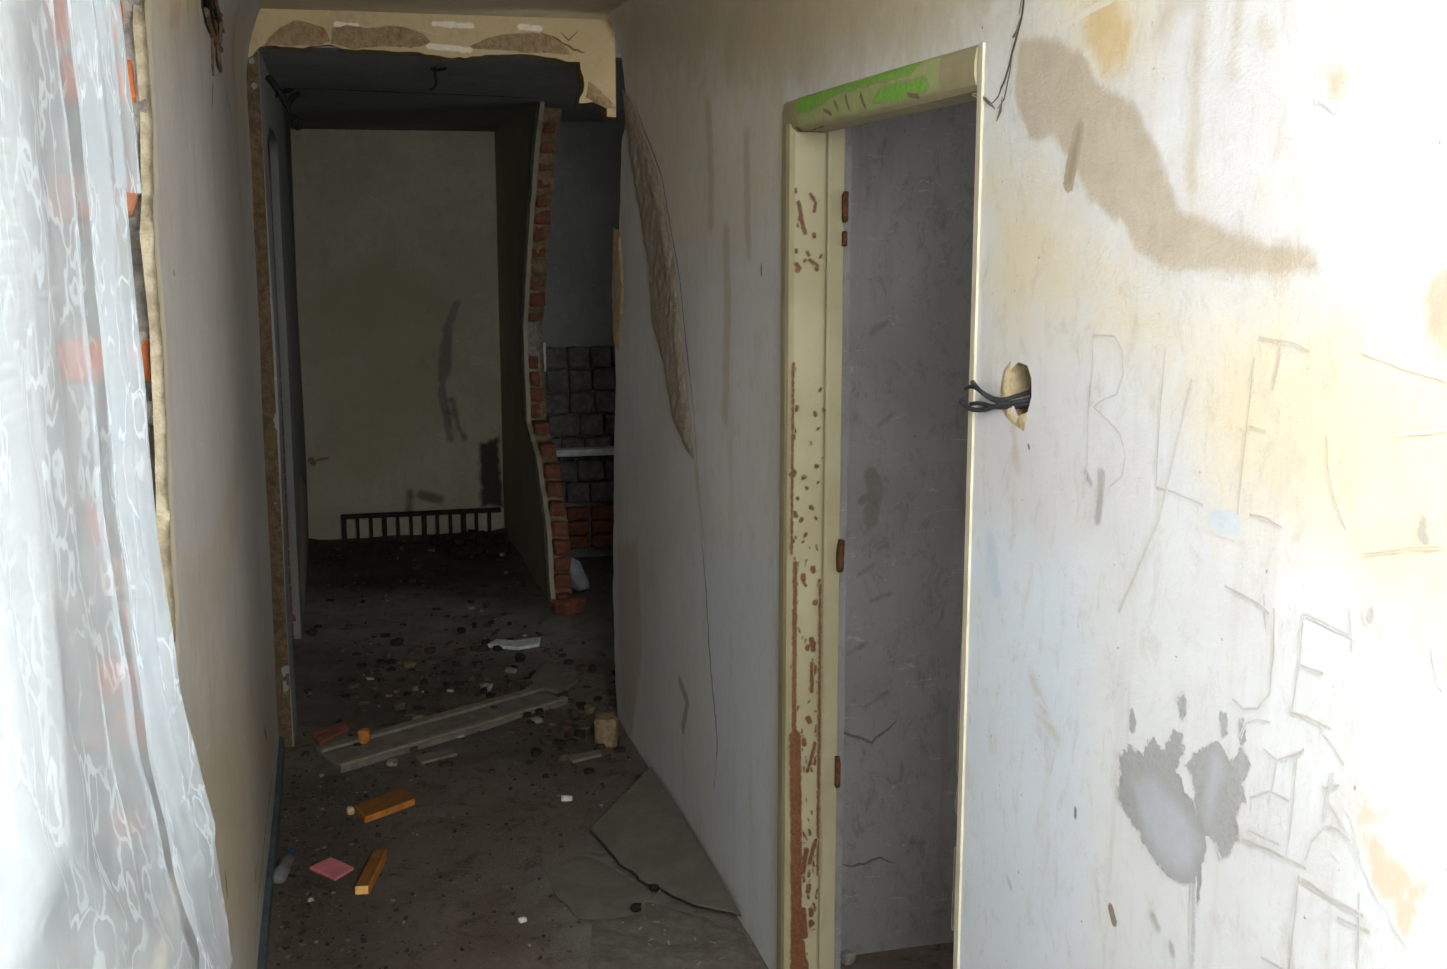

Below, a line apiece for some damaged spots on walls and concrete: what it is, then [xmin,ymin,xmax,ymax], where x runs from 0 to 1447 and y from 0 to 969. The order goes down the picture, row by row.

flaking render [0,0,196,858]
flaking render [246,20,573,747]
corrosion [788,361,826,969]
damp [1011,30,1324,285]
spalling [1116,694,1252,969]
damp [1415,260,1447,366]